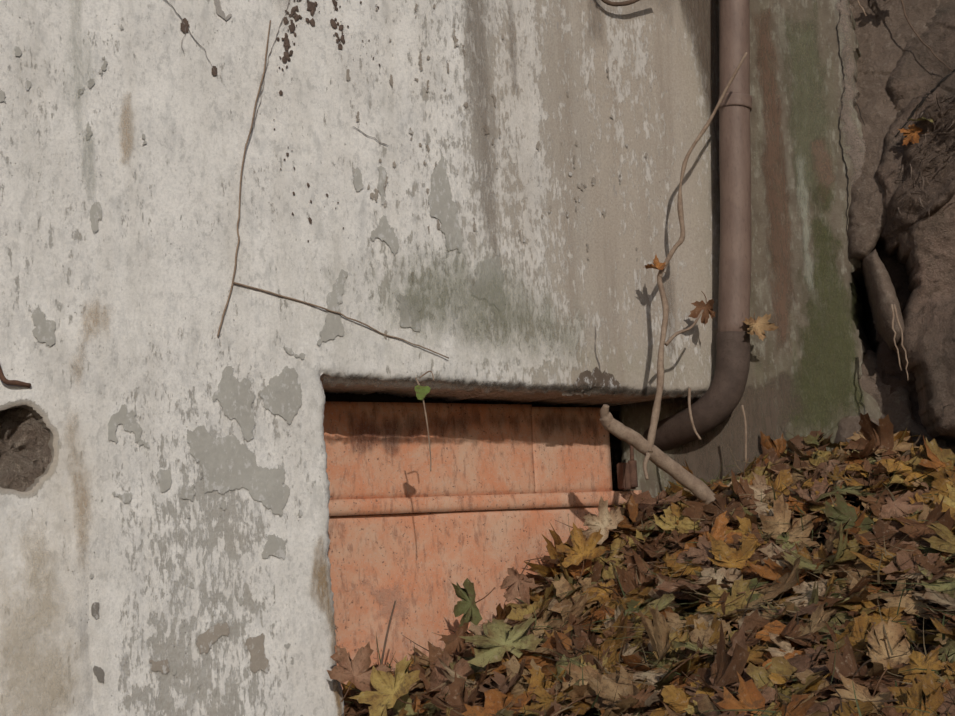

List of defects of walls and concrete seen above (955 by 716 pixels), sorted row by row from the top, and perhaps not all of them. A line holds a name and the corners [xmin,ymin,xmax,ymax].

water stain [681,0,720,197]
peeling [353,158,399,256]
peeling [409,128,463,253]
peeling [317,270,348,346]
peeling [396,293,422,332]
peeling [108,404,149,448]
peeling [155,346,306,517]
peeling [113,492,132,504]
peeling [262,534,287,559]
peeling [149,659,176,675]
peeling [194,610,230,654]
peeling [245,623,275,673]